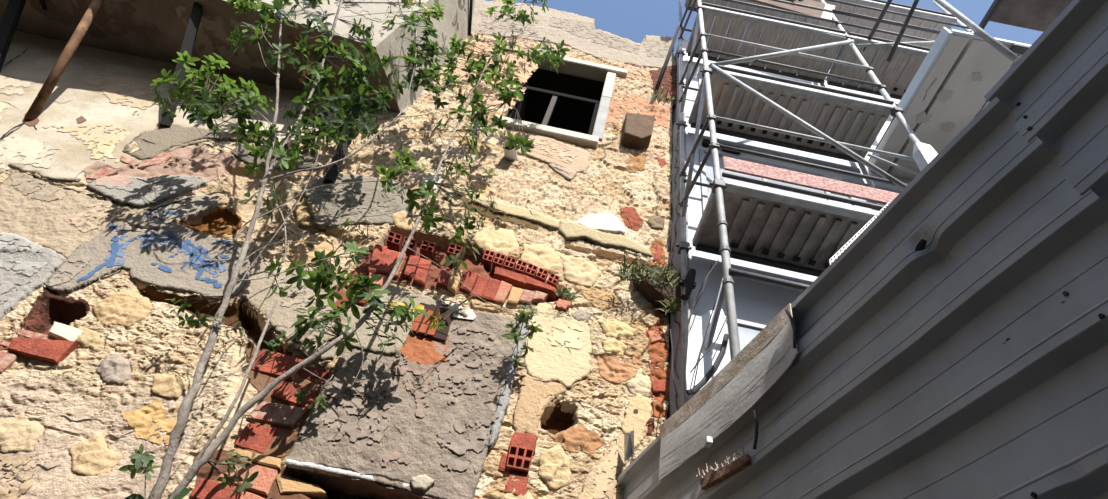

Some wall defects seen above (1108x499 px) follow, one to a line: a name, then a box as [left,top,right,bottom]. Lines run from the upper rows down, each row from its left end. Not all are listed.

flaking render [0,124,671,499]